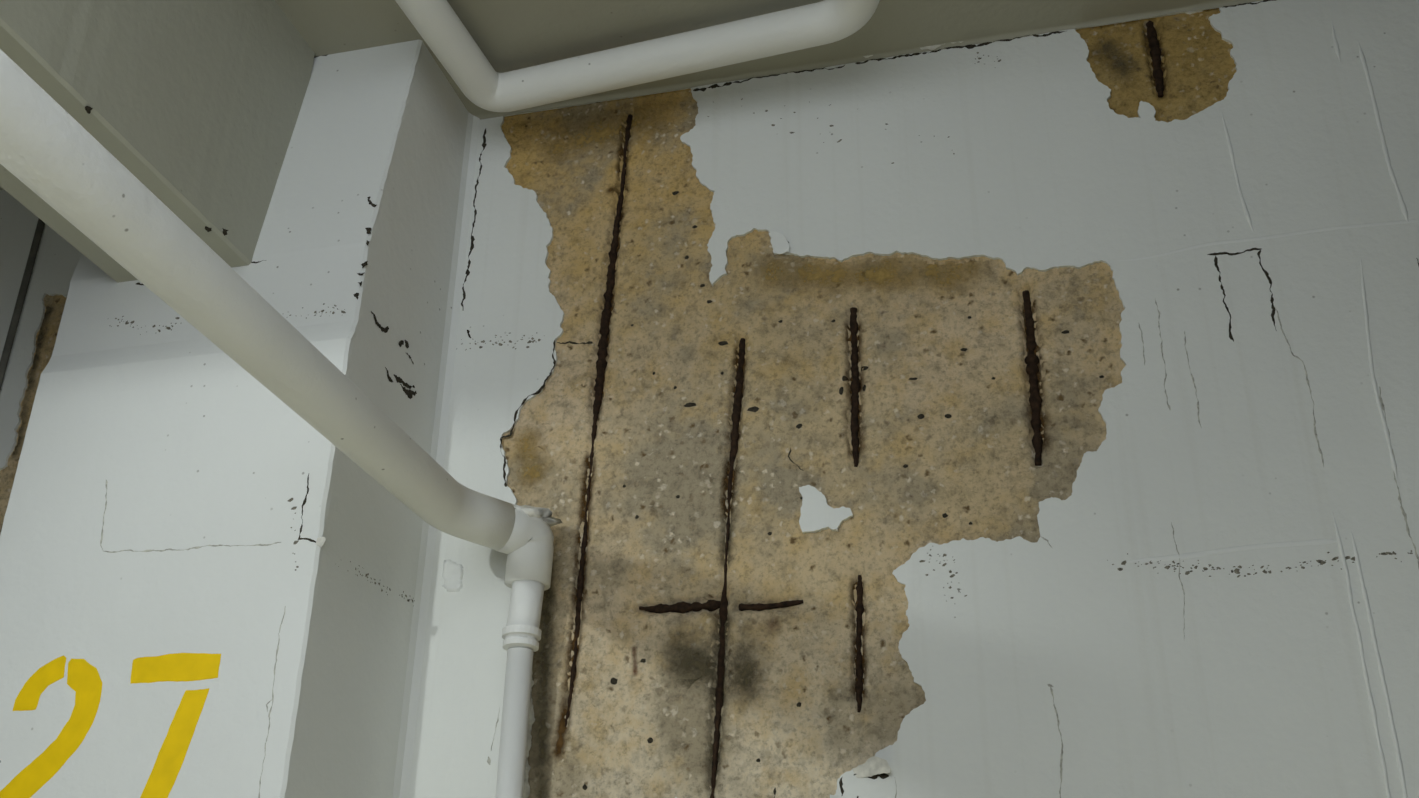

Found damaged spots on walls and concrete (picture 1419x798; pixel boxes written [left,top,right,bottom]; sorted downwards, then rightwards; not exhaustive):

spalling [1076,8,1236,123]
crack [461,129,487,338]
rust [607,126,628,272]
spalling [0,294,67,534]
rust [553,456,594,757]
rust [721,461,737,518]
spalling [501,88,1126,798]
crack [1139,300,1201,426]
crack [1171,522,1185,637]
crack [1208,248,1324,467]
crack [1379,386,1419,568]